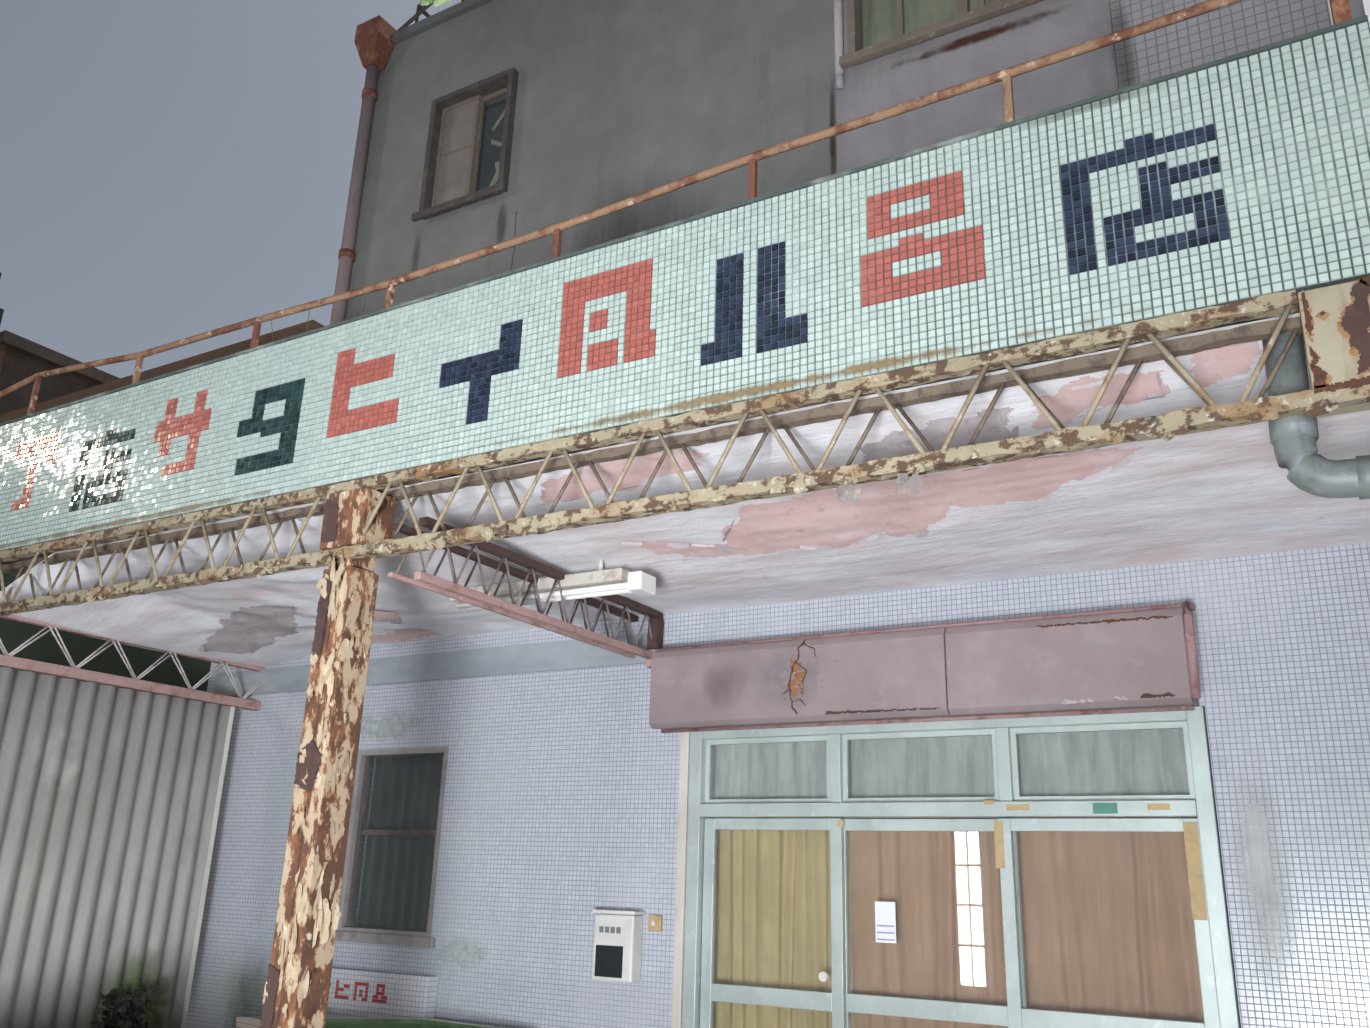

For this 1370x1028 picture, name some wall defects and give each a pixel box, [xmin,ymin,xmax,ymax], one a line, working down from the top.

corrosion [921,13,1046,58]
corrosion [1300,276,1370,395]
corrosion [595,349,955,425]
peeling [1245,405,1280,423]
peeling [1305,395,1339,417]
peeling [622,341,1263,558]
corrosion [0,500,227,548]
corrosion [320,499,339,543]
peeling [385,534,461,553]
corrosion [312,577,332,656]
crack [781,639,817,715]
corrosion [294,739,322,793]